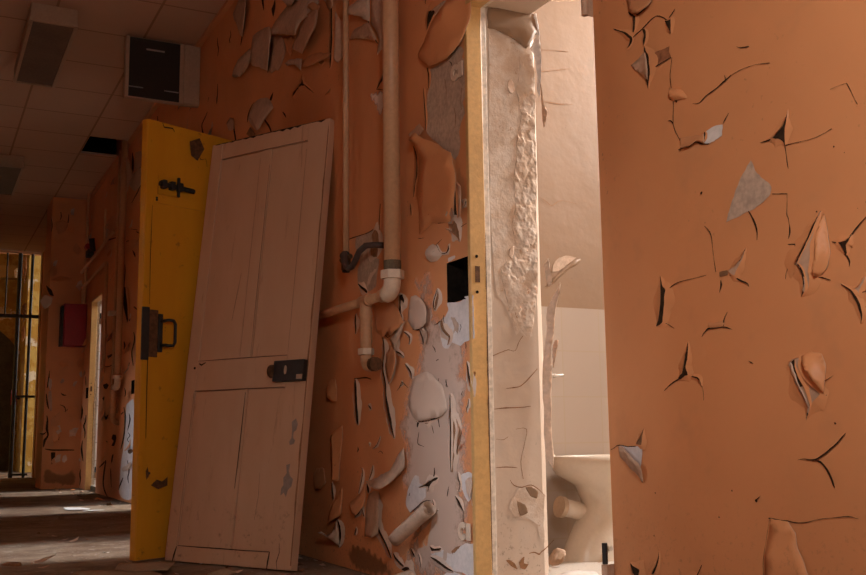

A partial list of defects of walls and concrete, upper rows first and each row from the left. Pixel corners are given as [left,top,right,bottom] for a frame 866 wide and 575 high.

peeling [232,0,383,77]
crack [613,9,675,51]
peeling [408,0,471,242]
crack [669,46,769,141]
crack [760,109,831,166]
spalling [487,8,581,468]
peeling [784,210,831,297]
crack [833,217,866,266]
crack [664,313,730,398]
flaking render [99,385,134,500]
peeling [313,279,477,575]
crack [799,433,846,488]